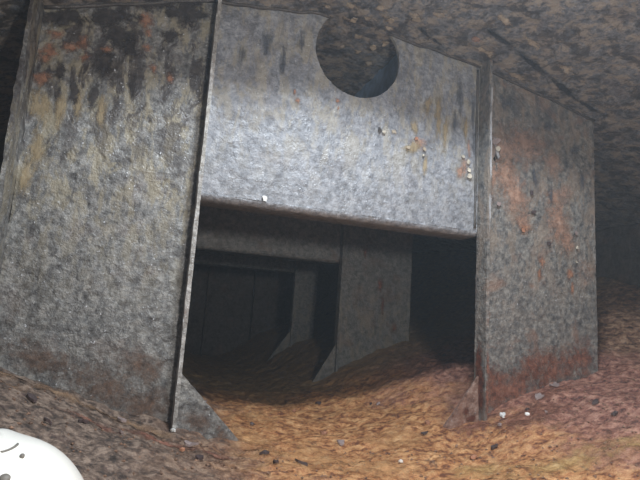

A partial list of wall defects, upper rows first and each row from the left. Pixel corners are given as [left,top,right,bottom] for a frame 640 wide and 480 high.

damp [30,82,106,128]
rust [475,344,489,415]